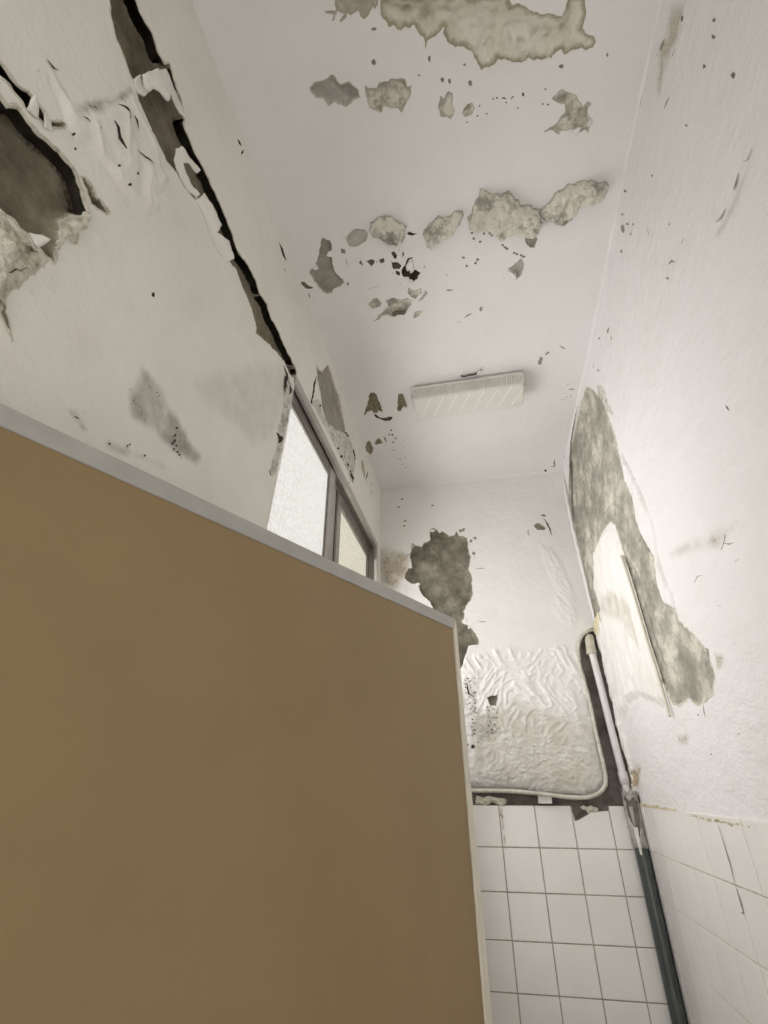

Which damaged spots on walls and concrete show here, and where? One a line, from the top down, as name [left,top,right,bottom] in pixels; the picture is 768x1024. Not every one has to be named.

spalling [324,0,597,71]
spalling [309,73,420,114]
spalling [542,88,592,136]
spalling [0,59,111,342]
crack [109,0,316,404]
spalling [308,228,427,322]
spalling [397,528,486,669]
leakage [465,677,498,749]